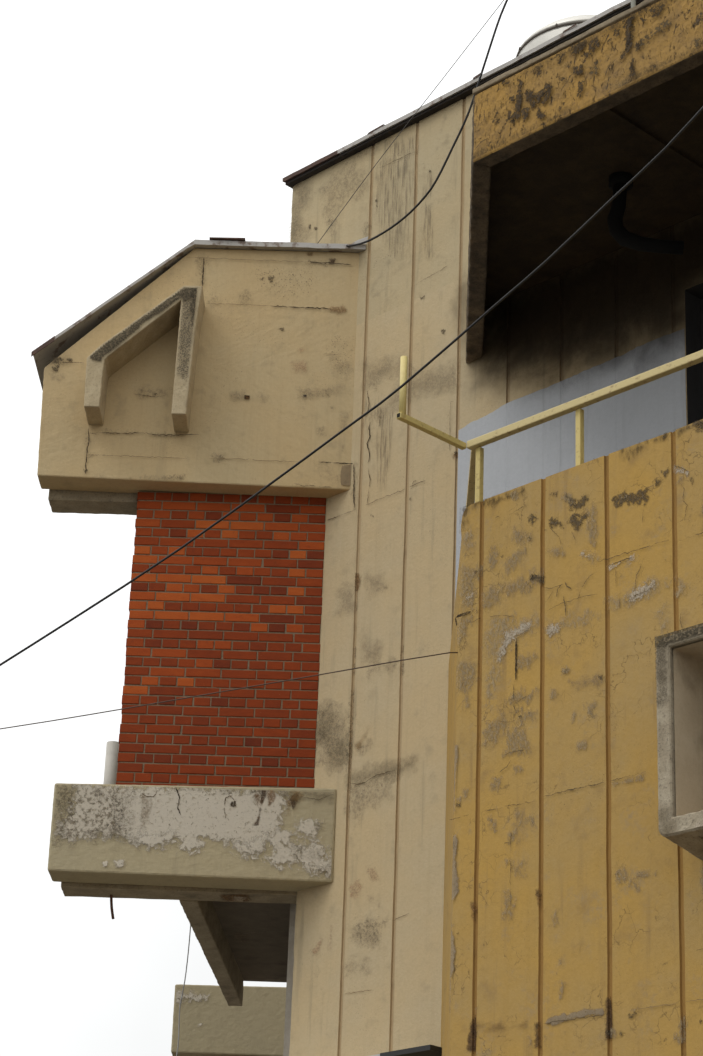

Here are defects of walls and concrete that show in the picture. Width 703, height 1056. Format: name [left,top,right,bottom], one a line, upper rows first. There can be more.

spalling [612,466,697,522]
spalling [459,492,635,609]
peeling [485,610,589,697]
peeling [53,784,332,877]
peeling [545,1008,604,1025]